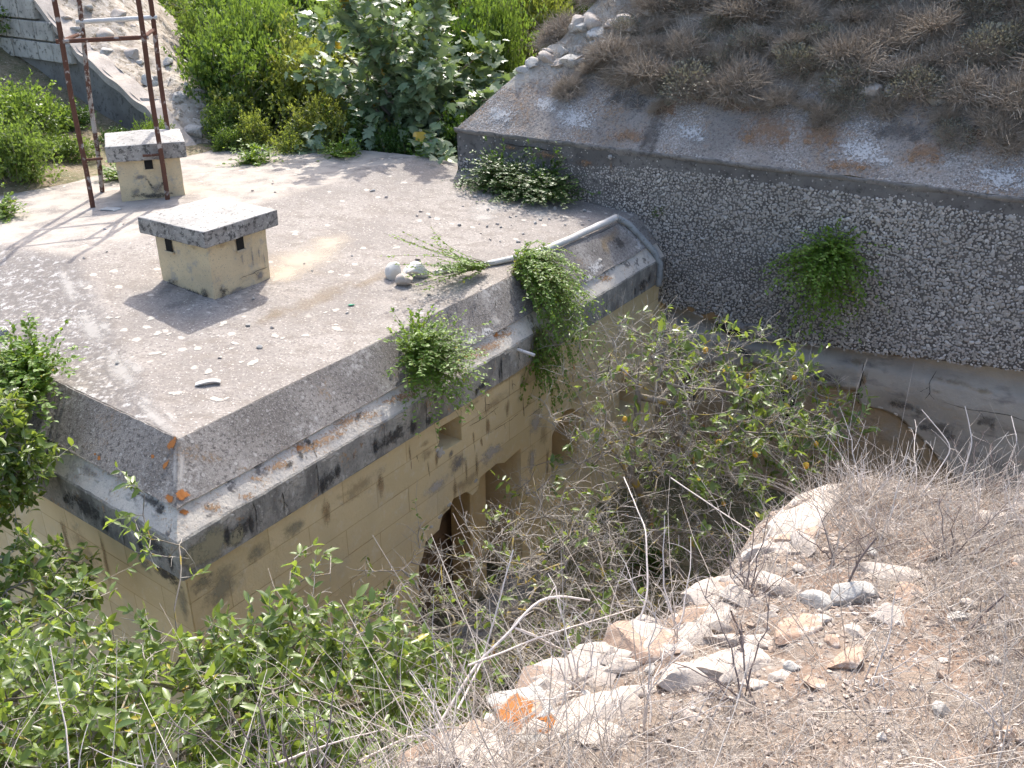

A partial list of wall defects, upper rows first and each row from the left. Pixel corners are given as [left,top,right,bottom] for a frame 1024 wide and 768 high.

leakage [374,417,433,452]
leakage [320,464,340,493]
leakage [63,492,108,530]